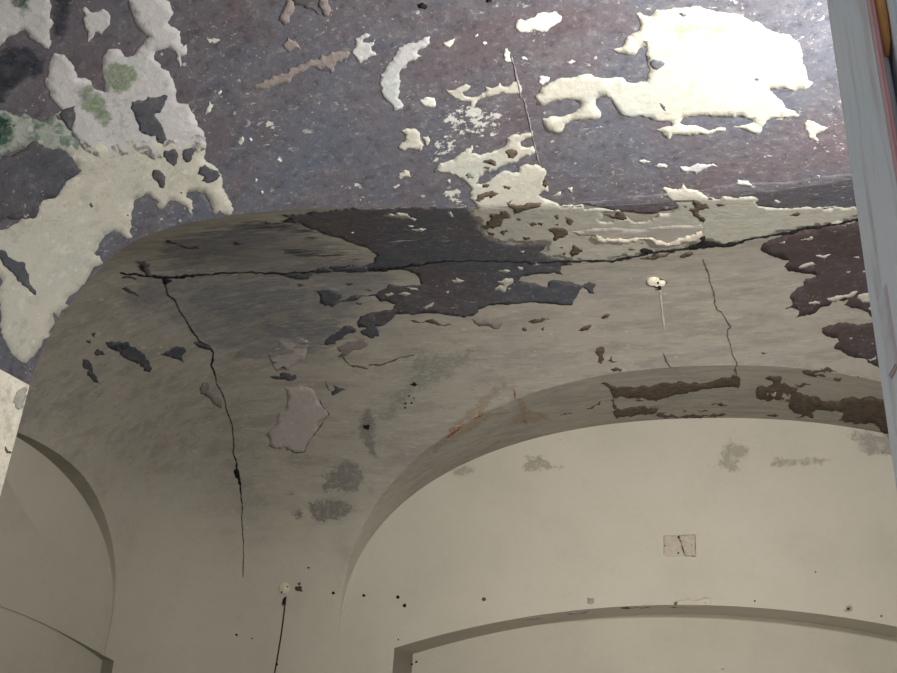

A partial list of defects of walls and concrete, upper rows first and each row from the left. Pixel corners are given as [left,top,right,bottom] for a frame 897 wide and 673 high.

peeling [515,11,562,33]
peeling [250,33,376,90]
peeling [380,36,430,111]
peeling [534,0,827,142]
peeling [0,0,233,363]
peeling [398,80,858,293]
peeling [384,212,425,232]
peeling [809,291,871,310]
peeling [321,314,415,369]
crack [120,218,858,574]
peeling [587,386,728,419]
peeling [766,367,841,403]